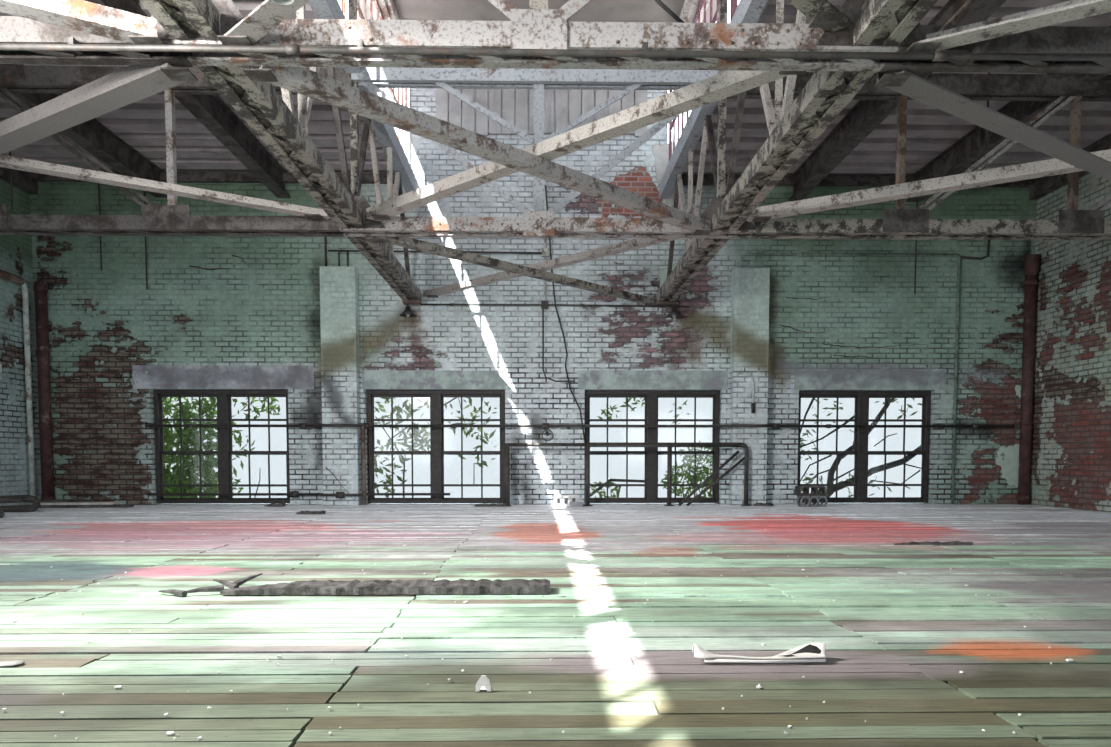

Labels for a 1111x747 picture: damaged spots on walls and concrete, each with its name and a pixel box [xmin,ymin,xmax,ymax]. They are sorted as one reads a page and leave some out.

peeling [558,186,652,218]
spalling [610,165,663,202]
peeling [0,334,33,380]
peeling [5,235,77,322]
peeling [48,299,168,505]
peeling [170,313,192,330]
peeling [583,260,720,370]
peeling [955,252,1111,511]